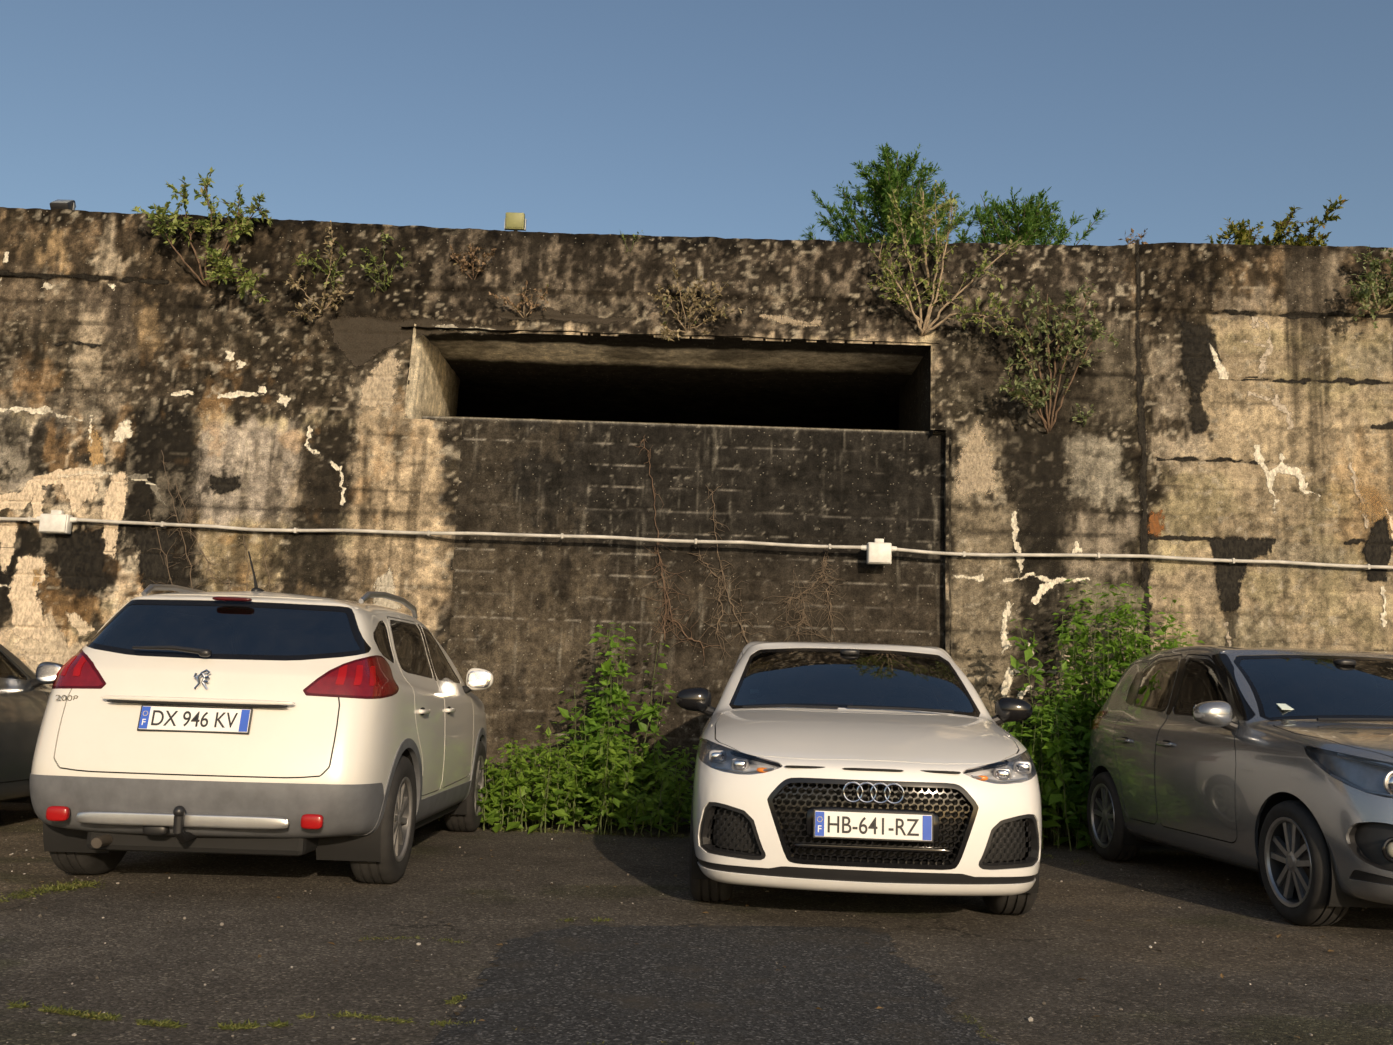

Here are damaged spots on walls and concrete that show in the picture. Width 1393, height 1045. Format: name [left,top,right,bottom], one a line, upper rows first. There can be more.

damp [225,351,246,369]
damp [258,386,291,407]
damp [1177,320,1229,434]
damp [1371,421,1393,430]
damp [210,475,241,494]
damp [1253,445,1320,509]
damp [0,415,179,643]
damp [374,569,400,610]
damp [1207,535,1276,647]
damp [1362,516,1393,627]
damp [1001,601,1014,652]